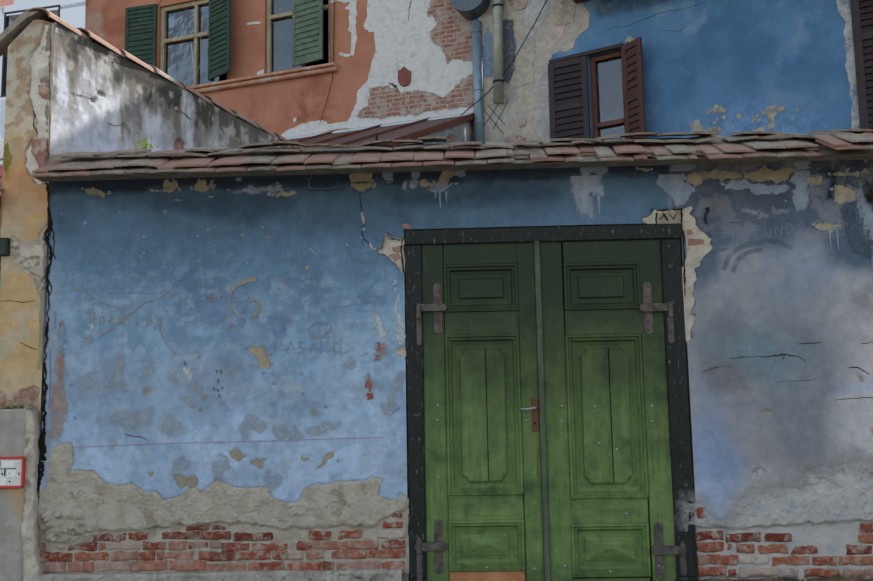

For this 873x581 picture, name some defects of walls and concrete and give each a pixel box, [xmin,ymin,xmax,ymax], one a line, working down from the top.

spalling [25,24,61,185]
peeling [281,0,590,144]
peeling [689,104,741,137]
peeling [751,105,785,133]
peeling [837,0,860,129]
spalling [376,223,411,272]
peeling [680,160,873,258]
water stain [856,182,873,266]
crack [700,342,819,382]
spalling [0,385,409,581]
spalling [684,459,873,581]